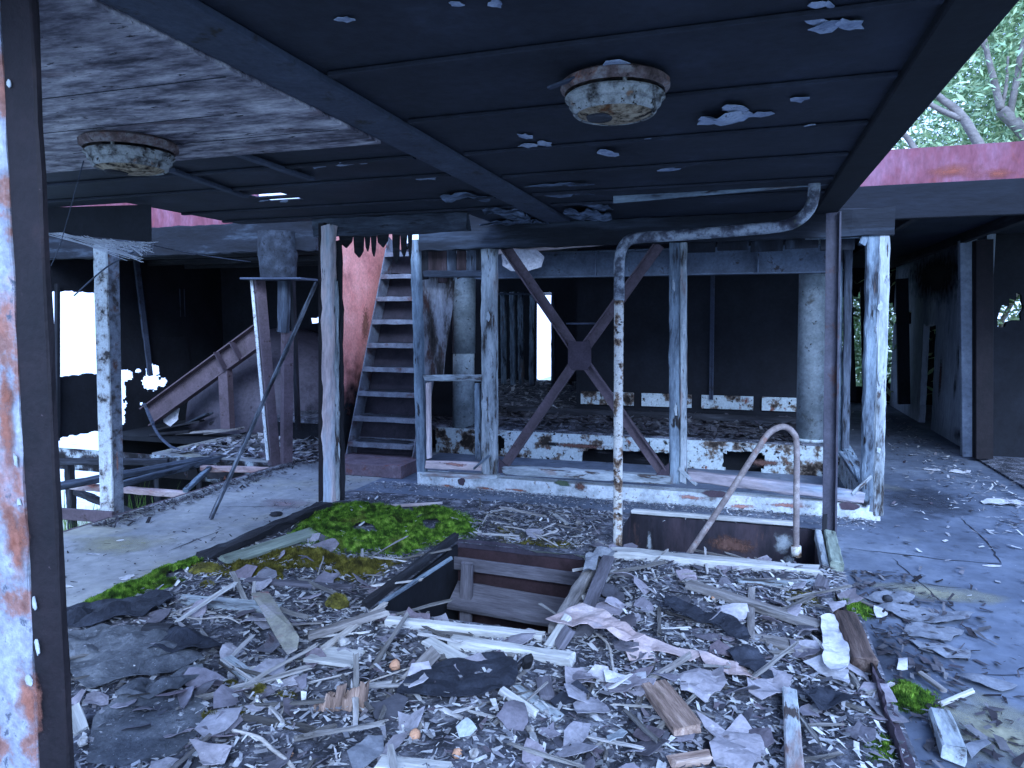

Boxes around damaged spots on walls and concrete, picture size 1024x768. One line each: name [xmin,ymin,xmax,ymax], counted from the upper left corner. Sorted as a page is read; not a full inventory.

peeling [805,1,864,34]
peeling [697,105,775,126]
peeling [517,133,552,148]
peeling [597,149,619,157]
corrosion [0,379,14,466]
corrosion [547,442,608,454]
corrosion [7,516,26,570]
crack [851,520,1002,611]
corrosion [16,680,40,730]